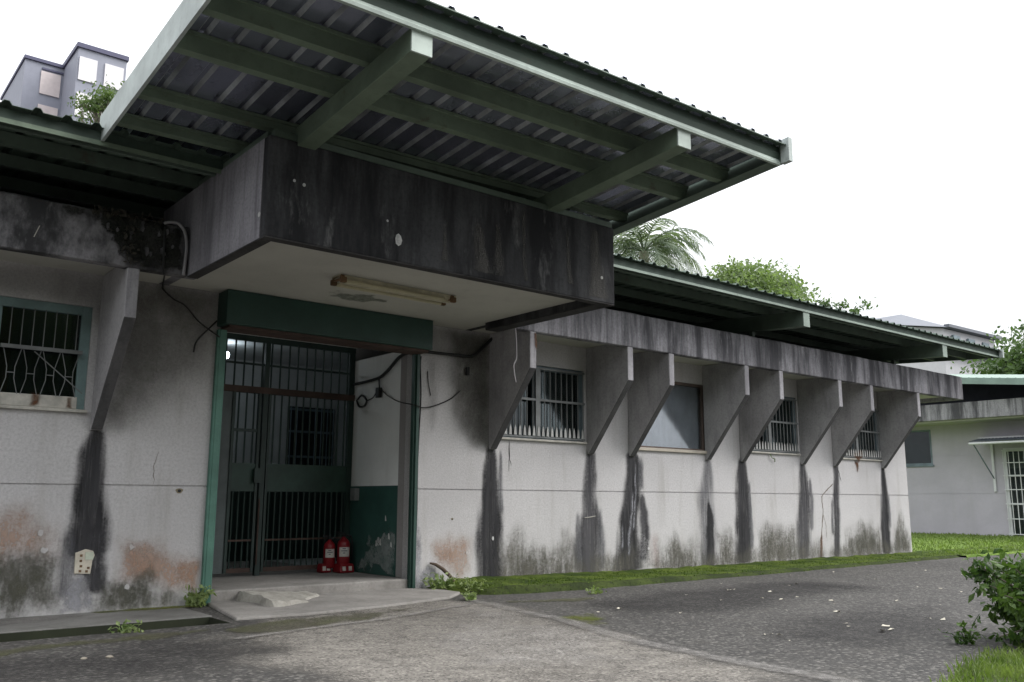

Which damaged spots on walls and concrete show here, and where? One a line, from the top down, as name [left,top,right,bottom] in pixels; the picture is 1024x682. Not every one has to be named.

leakage [0,430,172,618]
leakage [456,339,649,577]
leakage [662,460,909,568]